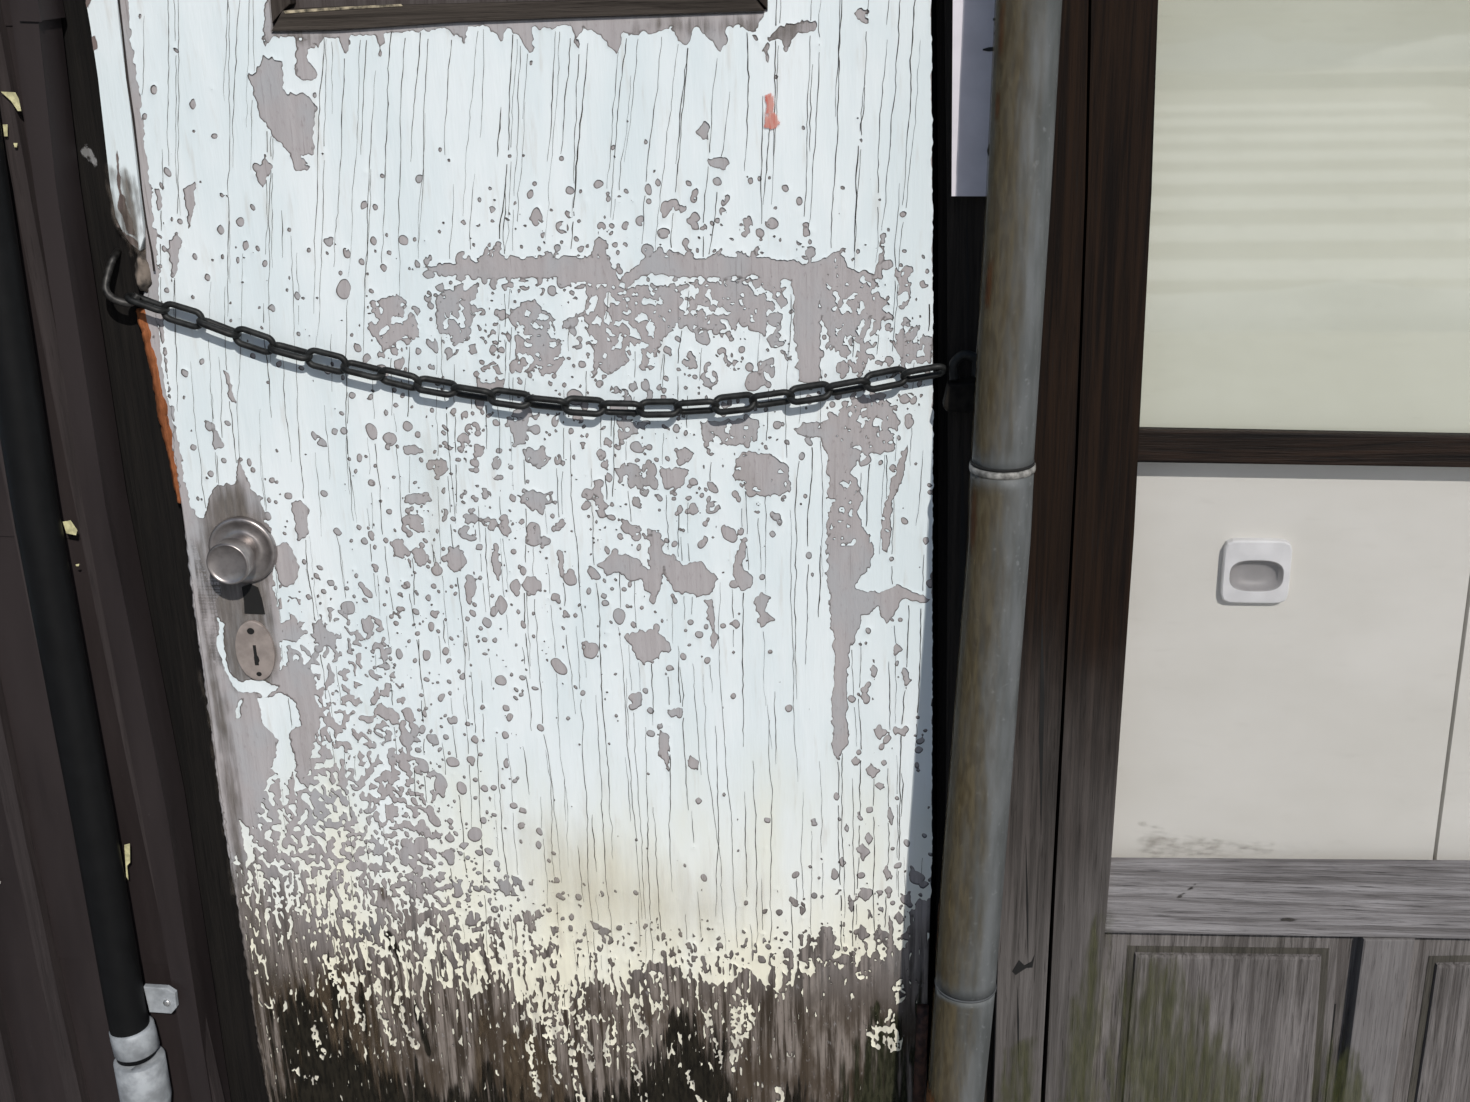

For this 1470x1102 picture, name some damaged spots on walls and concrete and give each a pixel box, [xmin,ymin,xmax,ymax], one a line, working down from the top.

peeling [116,0,933,1102]
water stain [384,931,411,974]
water stain [261,953,747,1102]
water stain [785,1078,806,1102]
water stain [839,973,922,1102]